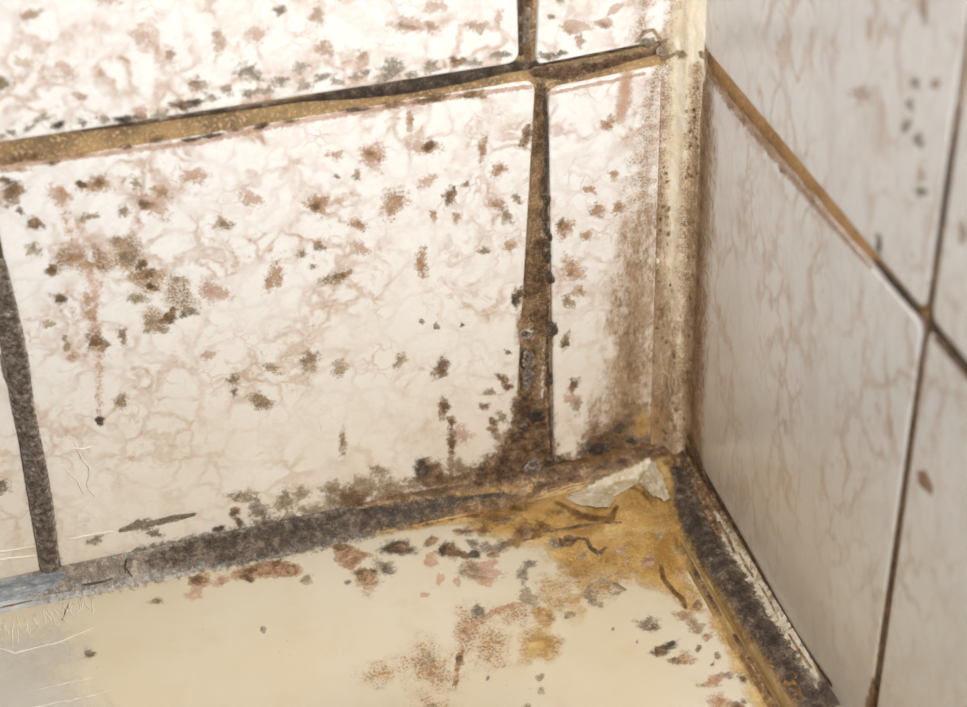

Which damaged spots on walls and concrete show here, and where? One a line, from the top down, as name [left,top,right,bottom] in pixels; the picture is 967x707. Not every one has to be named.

leakage [450,0,624,67]
leakage [78,76,231,127]
leakage [238,50,440,98]
leakage [384,90,486,154]
leakage [0,151,90,230]
leakage [50,173,110,204]
leakage [488,81,591,269]
leakage [45,235,229,334]
peeling [565,457,670,508]
leakage [119,513,196,537]
leakage [381,540,414,555]
leakage [404,560,567,690]